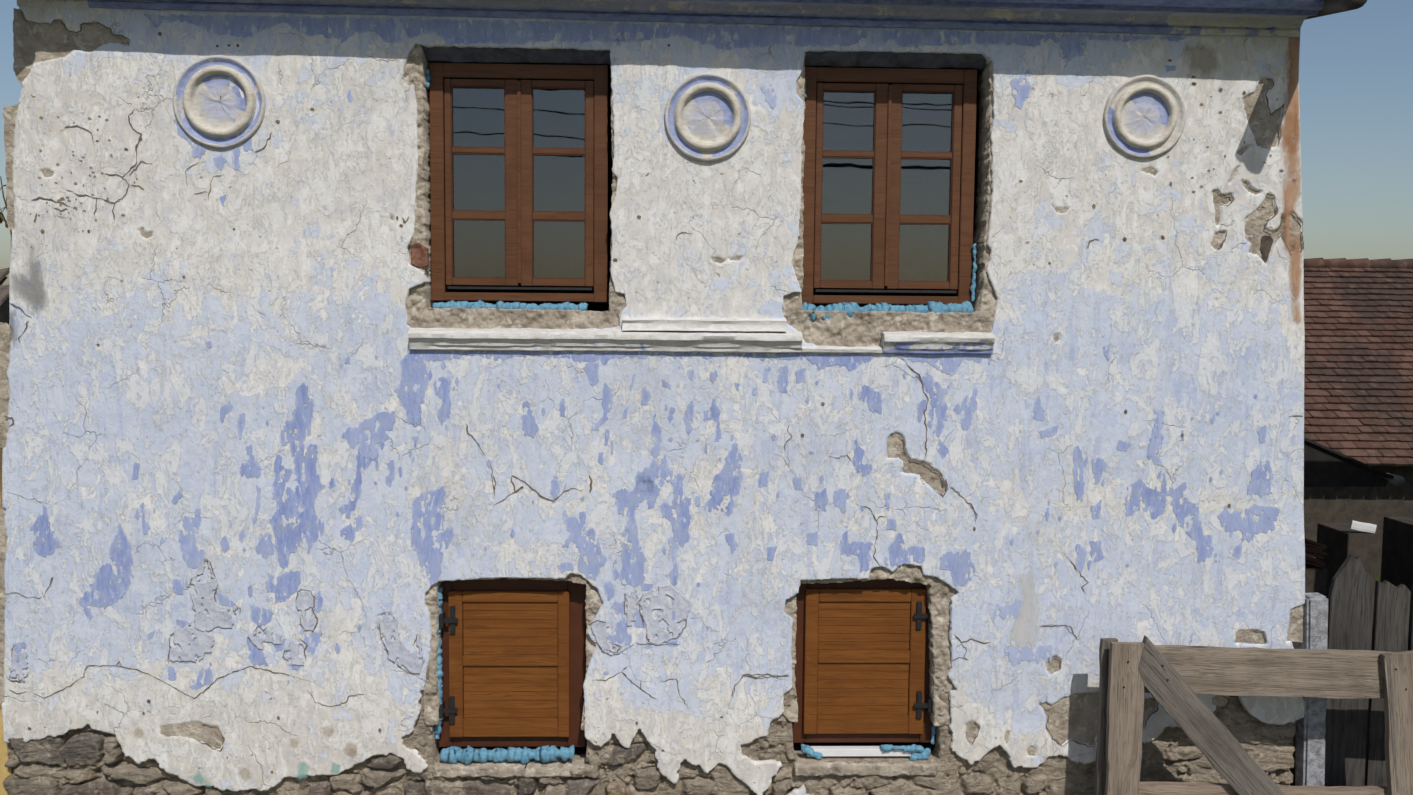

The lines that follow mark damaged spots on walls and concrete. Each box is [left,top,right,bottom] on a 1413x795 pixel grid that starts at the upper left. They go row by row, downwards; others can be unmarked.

spalling [13,8,130,84]
spalling [2,103,20,230]
crack [30,108,152,232]
spalling [1191,78,1304,263]
rust [1283,29,1301,321]
crack [465,423,593,504]
peeling [79,13,1187,752]
crack [902,359,929,452]
crack [950,486,978,522]
peeling [1125,409,1280,563]
crack [10,661,363,707]
spalling [1212,695,1230,708]